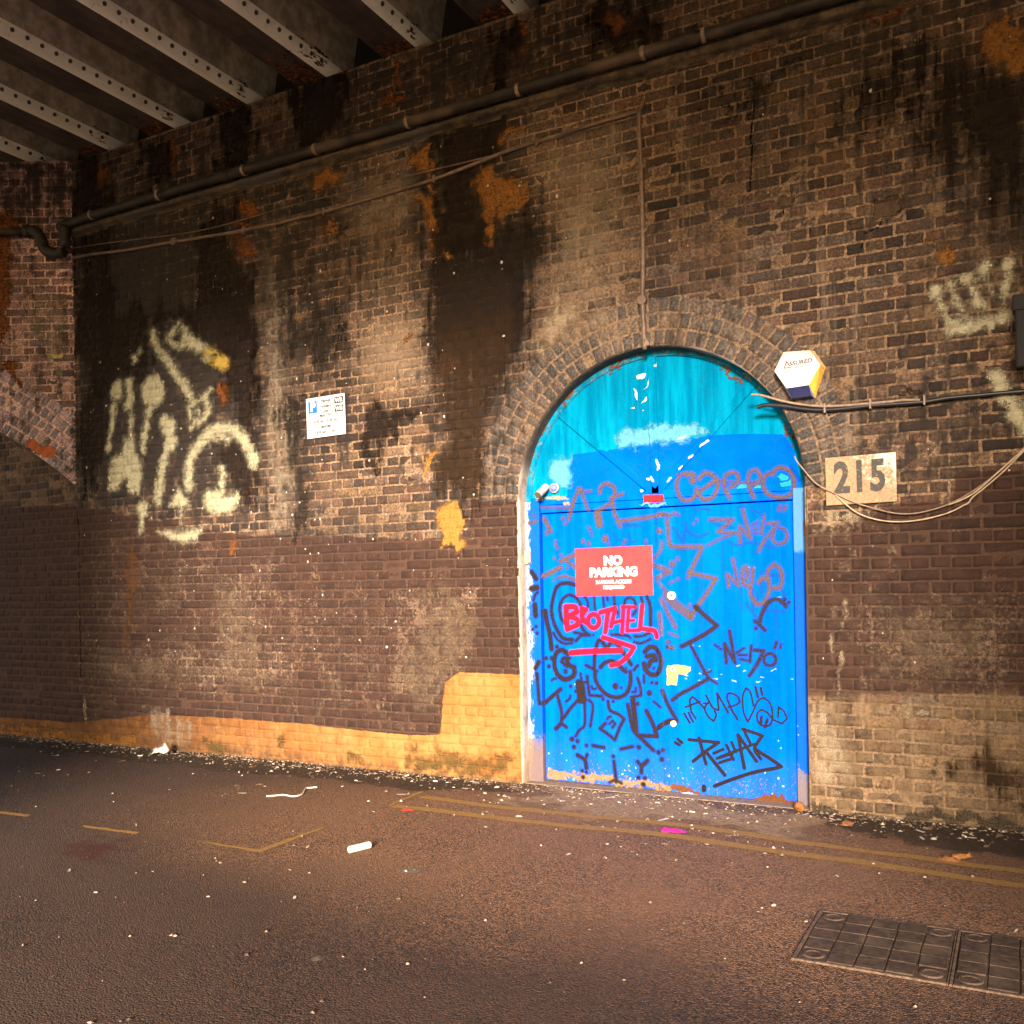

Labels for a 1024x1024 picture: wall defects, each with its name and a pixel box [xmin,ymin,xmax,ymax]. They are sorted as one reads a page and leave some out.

rust [973,11,1024,78]
rust [310,165,344,197]
rust [0,205,21,346]
water stain [269,292,351,380]
water stain [362,115,575,518]
water stain [809,704,854,793]
water stain [973,744,1008,796]